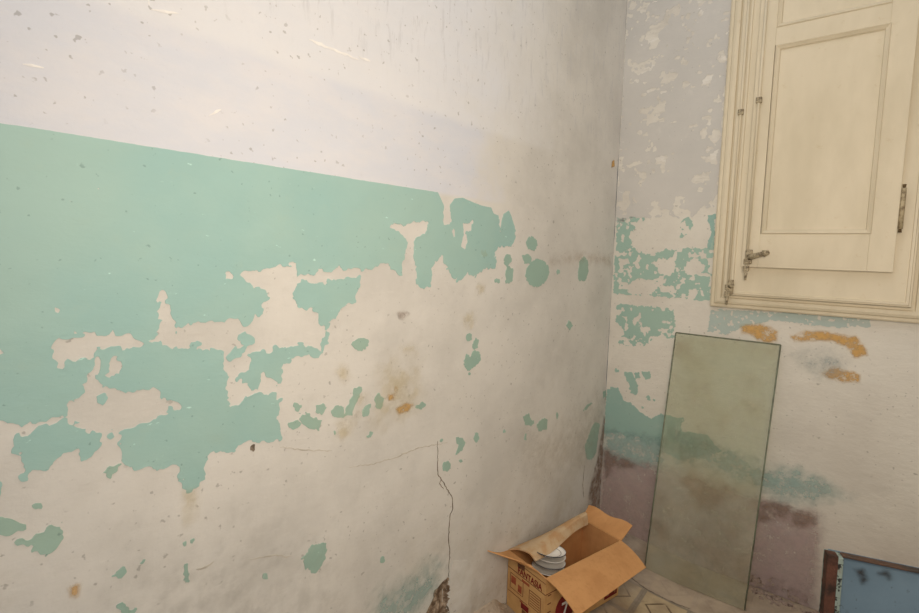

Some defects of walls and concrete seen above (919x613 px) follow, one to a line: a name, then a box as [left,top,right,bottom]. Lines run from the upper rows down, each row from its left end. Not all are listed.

peeling [578,256,589,281]
peeling [613,214,871,346]
peeling [0,123,560,494]
corrosion [742,325,776,342]
corrosion [792,331,866,357]
corrosion [825,369,859,382]
crack [349,441,453,577]
water stain [590,419,829,607]
peeling [0,517,64,557]
peeling [301,543,327,573]
peeling [116,602,137,613]
spalling [426,578,450,613]